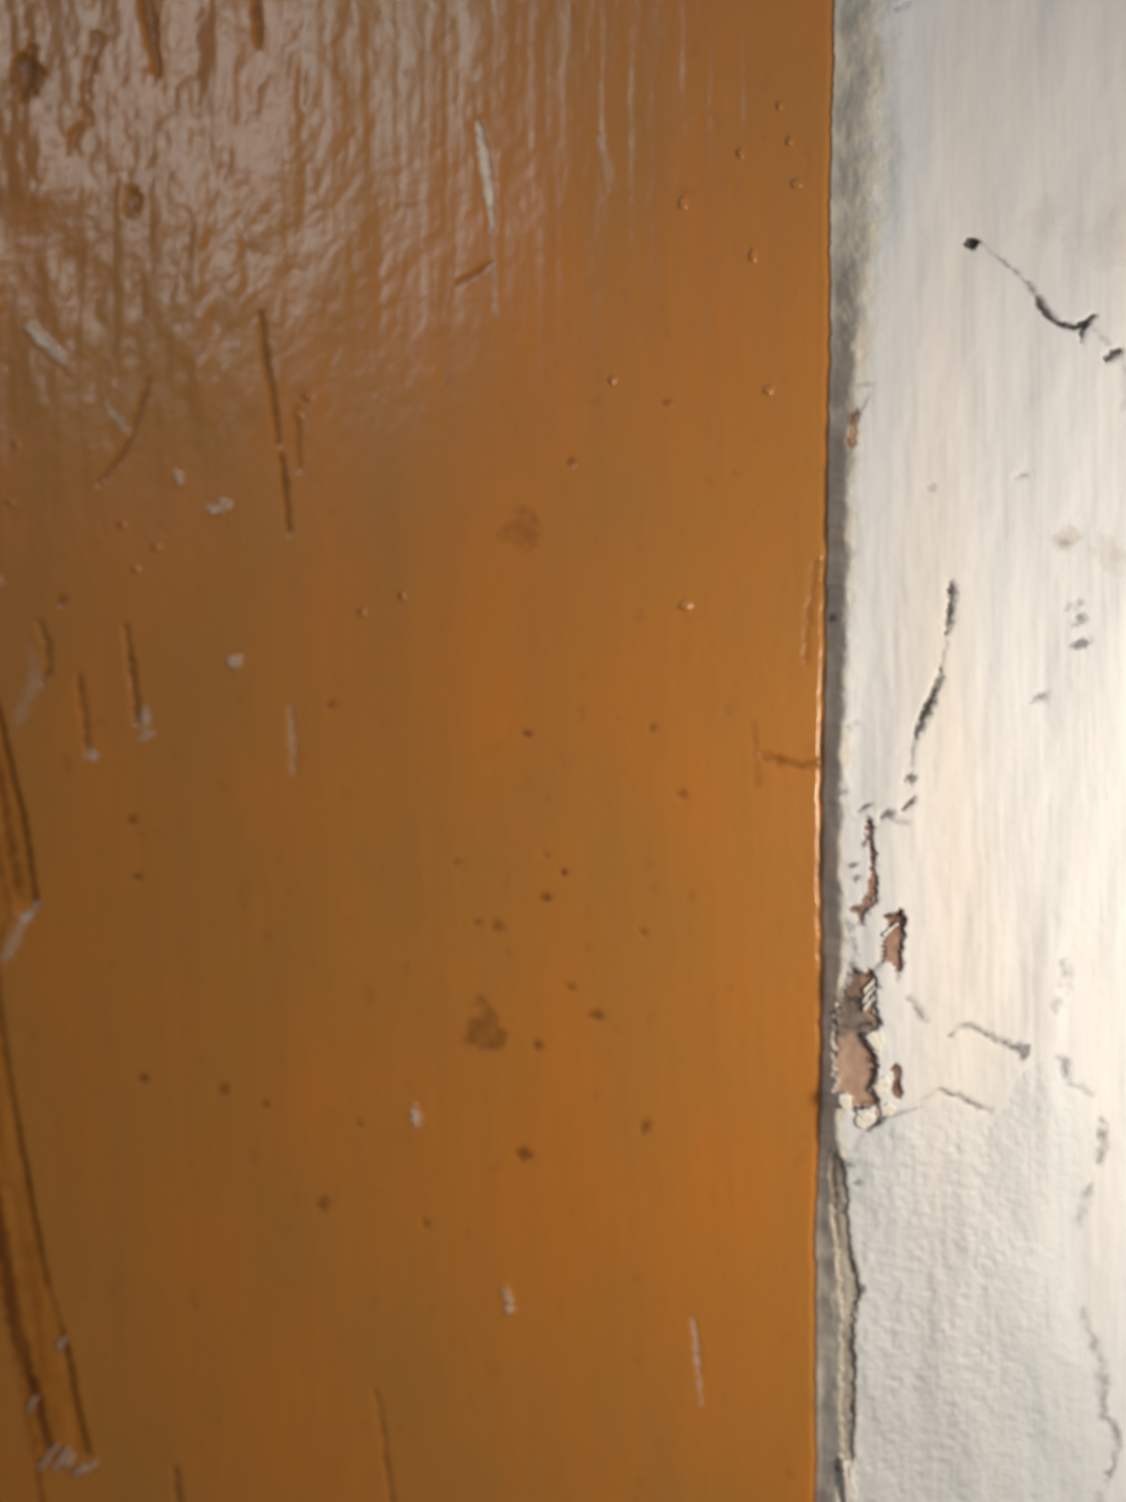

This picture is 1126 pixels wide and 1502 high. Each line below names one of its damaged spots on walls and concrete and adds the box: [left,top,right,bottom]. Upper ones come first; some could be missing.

crack [964,239,979,249]
crack [1031,288,1122,361]
crack [945,583,955,634]
crack [915,679,941,737]
crack [862,775,915,816]
spalling [832,818,906,1130]
spalling [830,1154,865,1502]